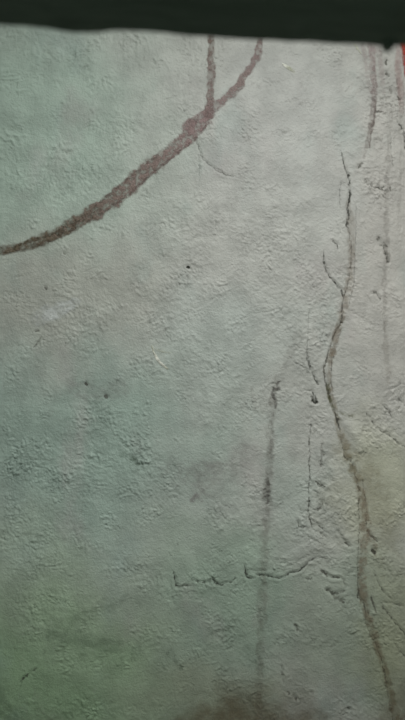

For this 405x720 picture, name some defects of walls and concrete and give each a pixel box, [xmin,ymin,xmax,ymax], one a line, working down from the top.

crack [343,162,351,226]
crack [308,355,339,426]